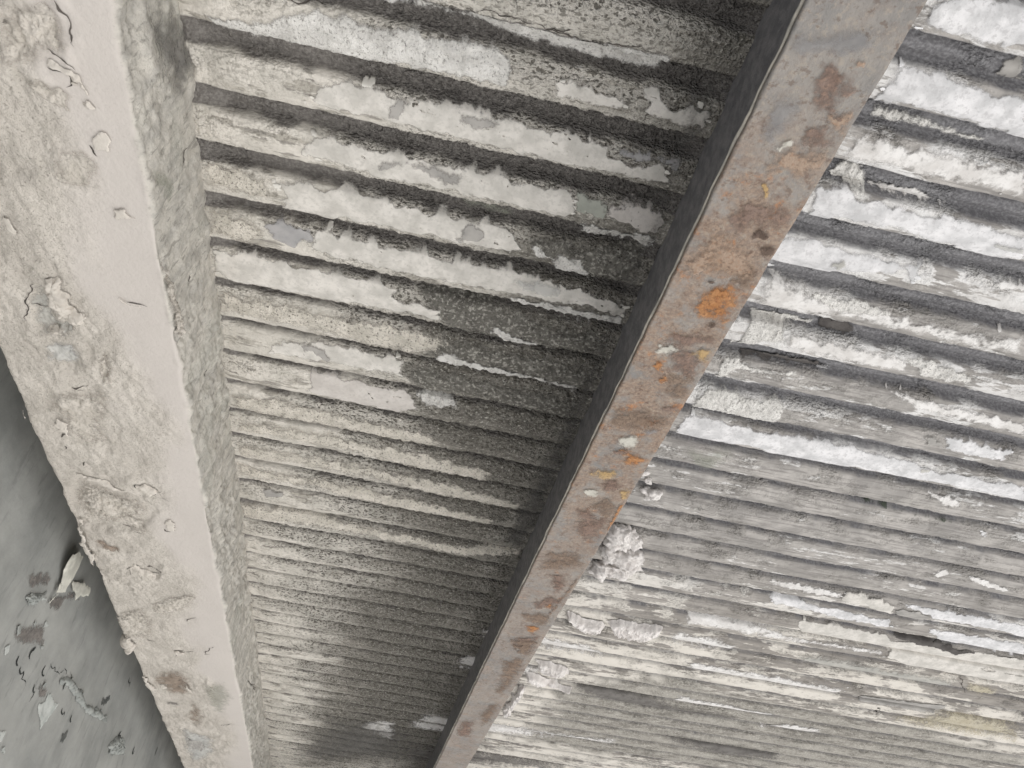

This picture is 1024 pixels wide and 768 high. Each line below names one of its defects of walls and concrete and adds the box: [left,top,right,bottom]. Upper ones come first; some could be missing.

rust [813,65,855,130]
peeling [874,56,1024,138]
peeling [213,179,630,320]
peeling [301,128,664,233]
rust [688,237,755,324]
peeling [804,181,1024,259]
rust [653,333,713,412]
peeling [676,407,1024,507]
rust [577,471,627,538]
rust [496,553,580,693]
peeling [672,579,1024,687]
damp [470,751,564,768]